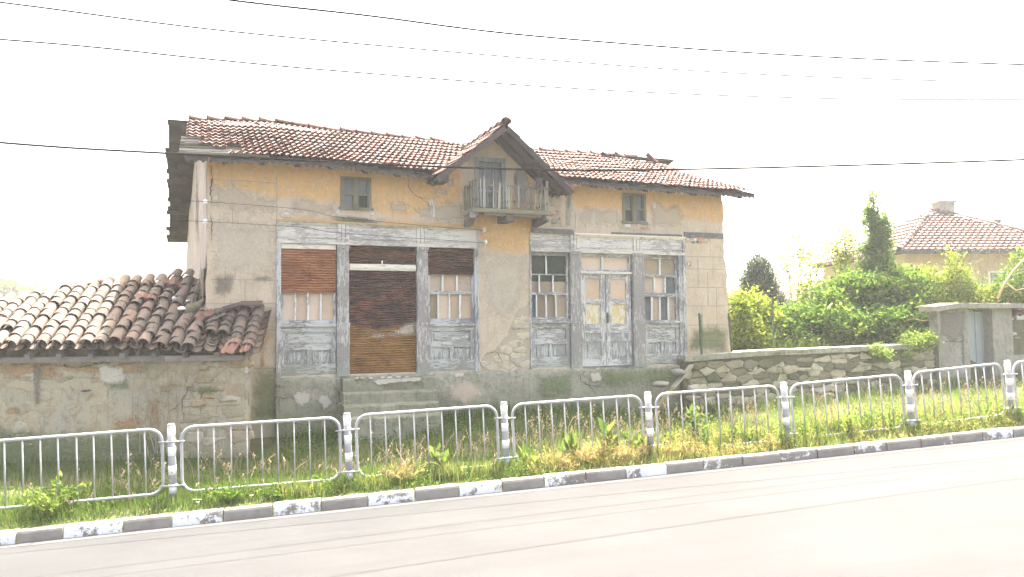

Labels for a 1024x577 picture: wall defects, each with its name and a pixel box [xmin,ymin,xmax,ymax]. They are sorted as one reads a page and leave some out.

crack [195,166,215,237]
damp [216,278,232,292]
spalling [480,302,531,372]